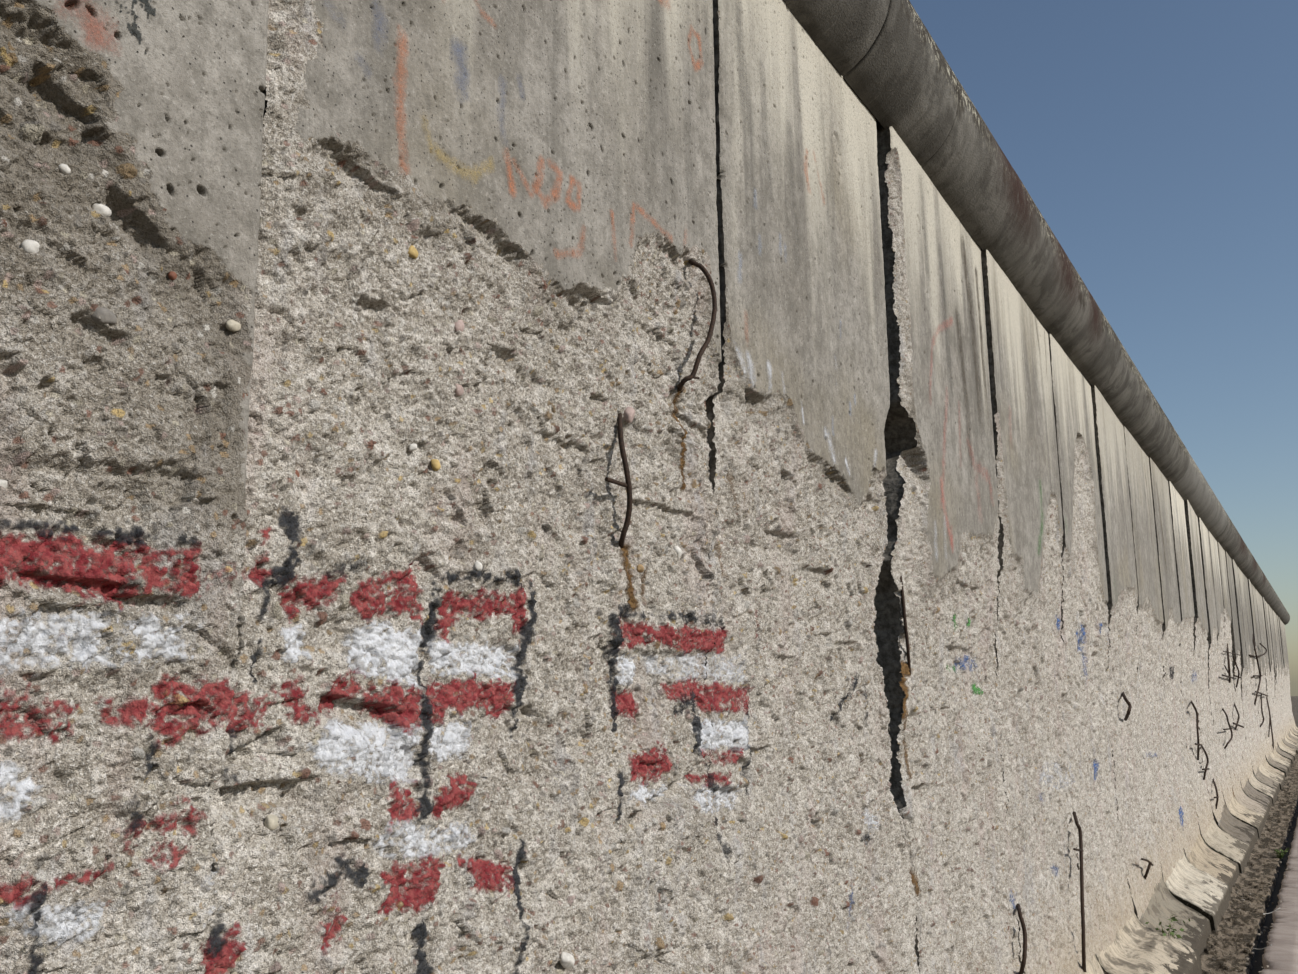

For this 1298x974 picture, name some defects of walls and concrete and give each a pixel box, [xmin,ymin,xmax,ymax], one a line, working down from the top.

spalling [0,0,721,974]
rust [620,544,648,611]
rust [671,386,688,490]
spalling [703,147,1295,974]